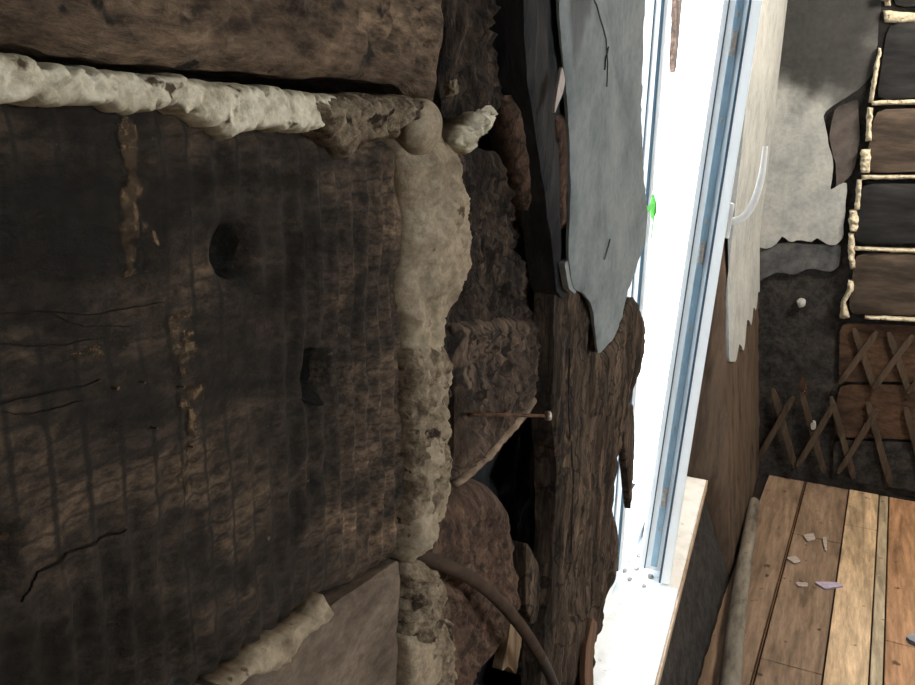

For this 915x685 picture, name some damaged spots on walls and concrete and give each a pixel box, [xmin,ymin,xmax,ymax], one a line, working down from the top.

flaking render [552,0,647,353]
flaking render [725,0,860,362]
crack [20,529,127,602]